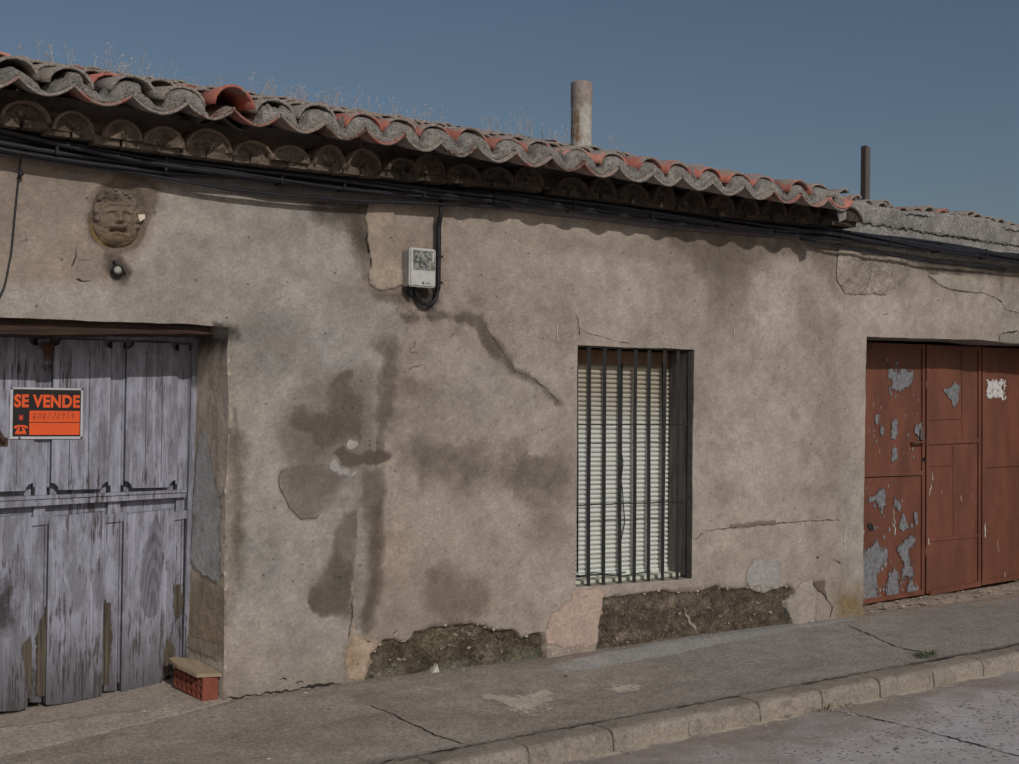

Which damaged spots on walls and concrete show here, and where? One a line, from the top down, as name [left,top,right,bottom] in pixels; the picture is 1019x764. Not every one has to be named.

crack [948,288,1019,334]
leakage [294,371,390,466]
crack [696,519,838,539]
flaking render [596,586,794,649]
flaking render [345,618,543,681]